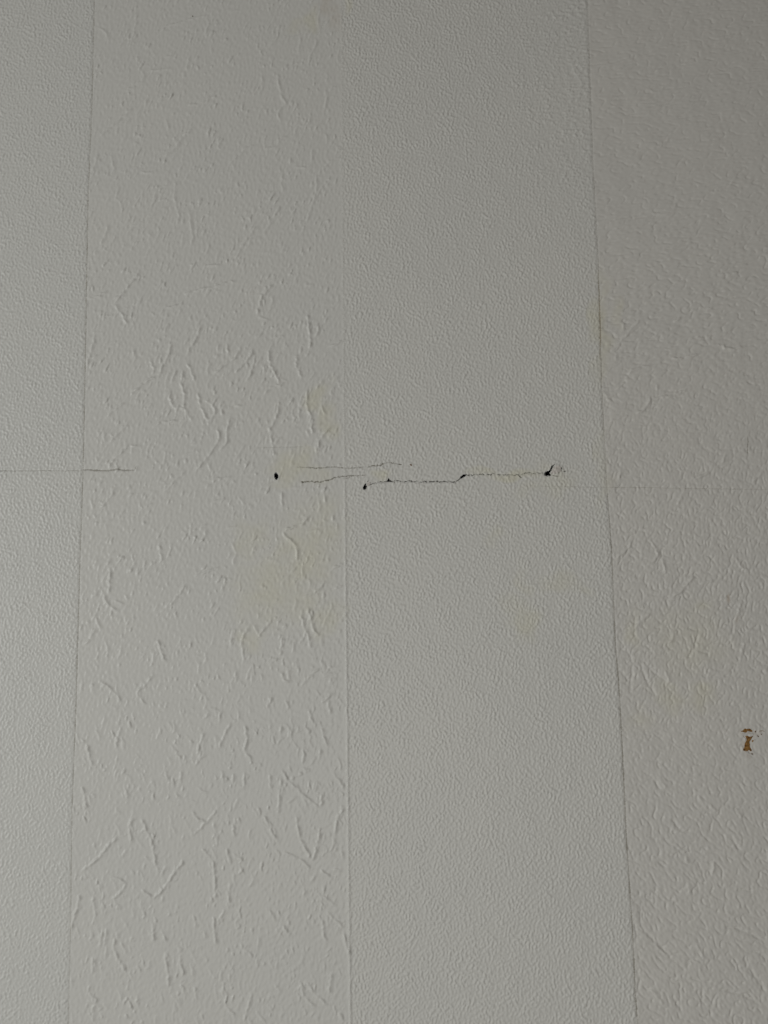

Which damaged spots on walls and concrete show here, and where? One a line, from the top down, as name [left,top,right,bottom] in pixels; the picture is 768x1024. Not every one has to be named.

crack [307,462,565,490]